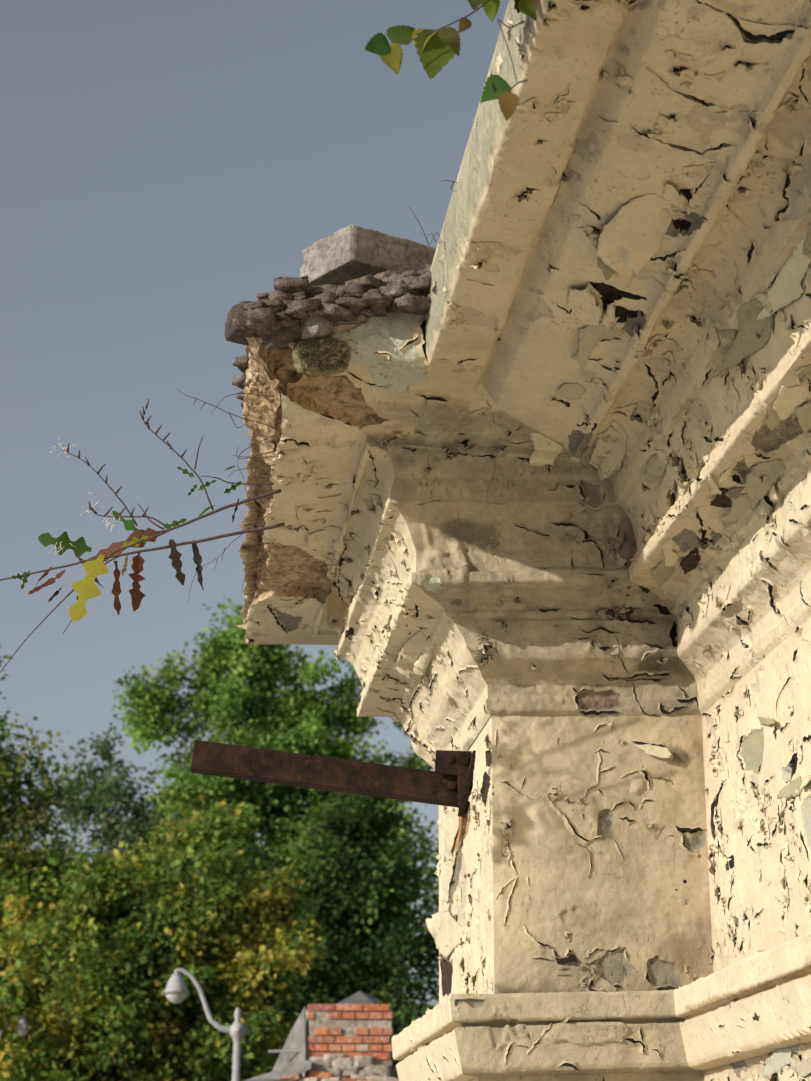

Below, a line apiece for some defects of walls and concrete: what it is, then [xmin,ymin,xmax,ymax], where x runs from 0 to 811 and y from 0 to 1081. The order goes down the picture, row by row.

spalling [239,312,465,764]
crack [269,315,630,753]
crack [448,812,624,993]
crack [499,748,672,878]
spalling [571,683,623,732]
spalling [551,929,697,991]
peeling [511,153,811,676]
crack [526,585,797,965]
crack [588,332,771,600]
peeling [645,675,811,962]
peeling [716,1044,811,1081]
crack [761,578,811,684]